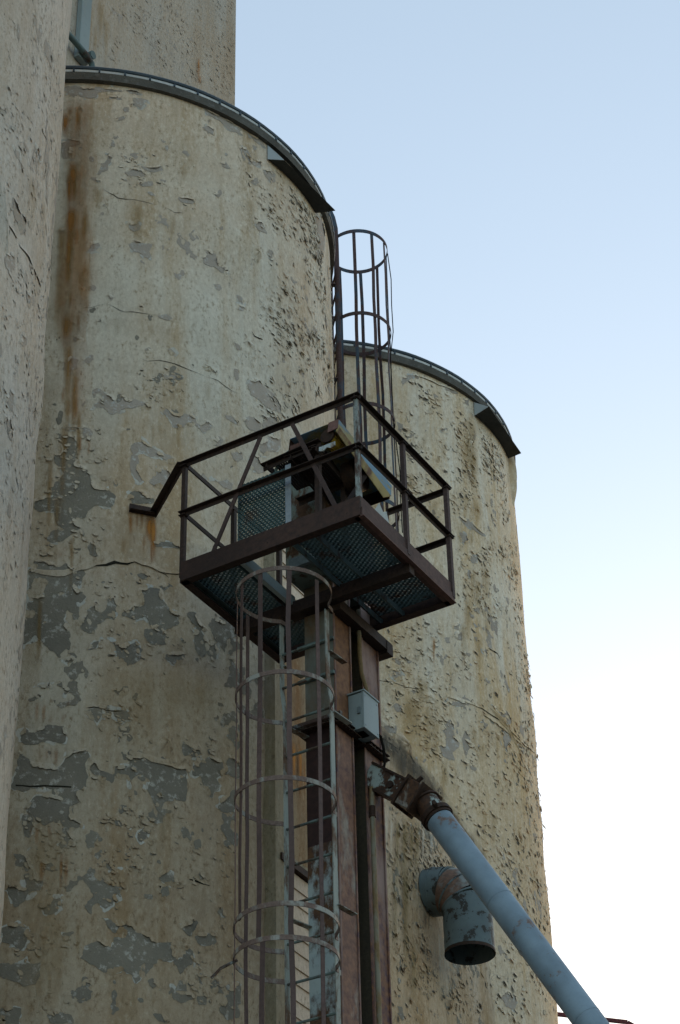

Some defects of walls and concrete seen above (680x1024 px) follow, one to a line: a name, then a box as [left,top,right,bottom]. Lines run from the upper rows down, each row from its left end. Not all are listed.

corrosion [60,211,86,275]
peeling [202,108,335,473]
crack [31,558,179,578]
peeling [0,0,265,1020]
peeling [384,373,552,937]
peeling [386,806,559,1024]